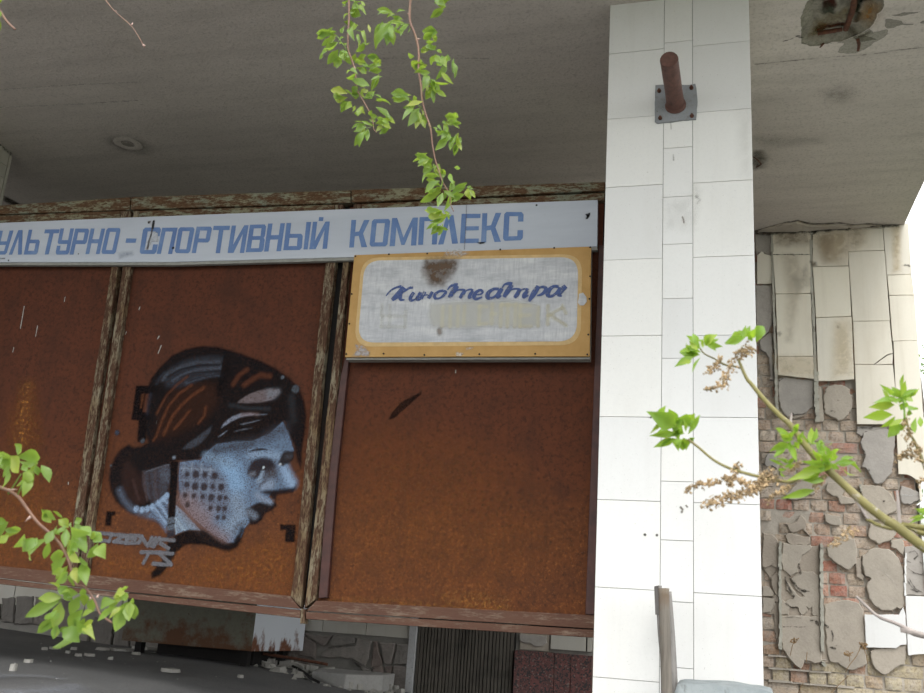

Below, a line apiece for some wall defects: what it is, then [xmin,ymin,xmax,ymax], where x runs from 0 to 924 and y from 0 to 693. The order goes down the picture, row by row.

spalling [800,0,924,54]
rust [0,263,326,596]
rust [317,203,604,615]
spalling [893,341,924,480]
spalling [864,596,924,655]